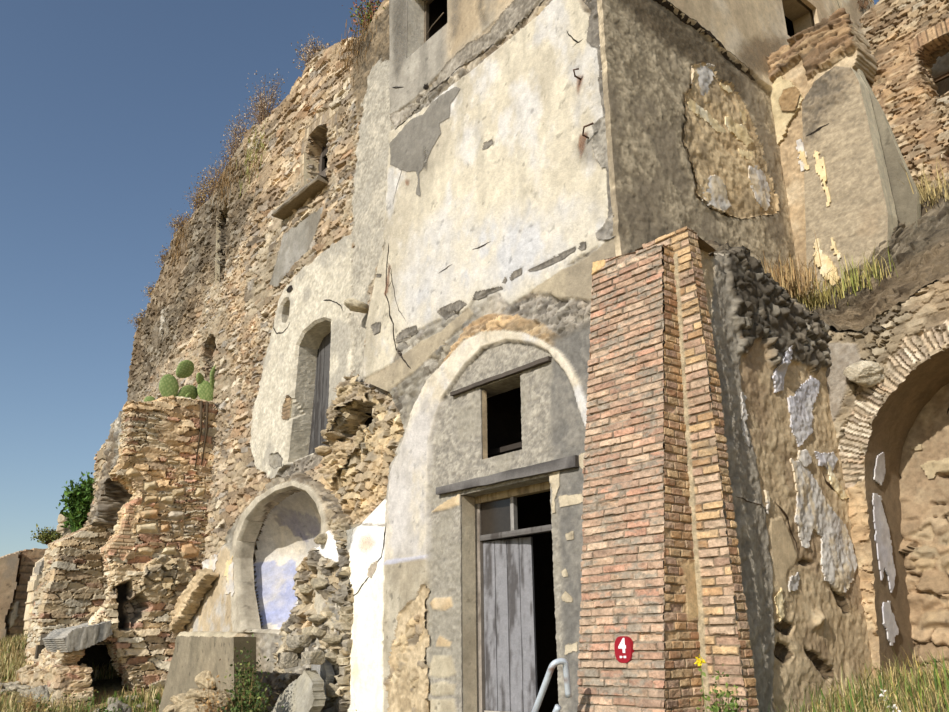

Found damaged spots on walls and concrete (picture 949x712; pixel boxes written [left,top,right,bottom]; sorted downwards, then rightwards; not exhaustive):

flaking render [683,62,779,219]
flaking render [770,76,831,207]
crack [385,243,411,369]
spalling [395,325,418,343]
crack [353,527,386,596]
flaking render [383,584,430,712]